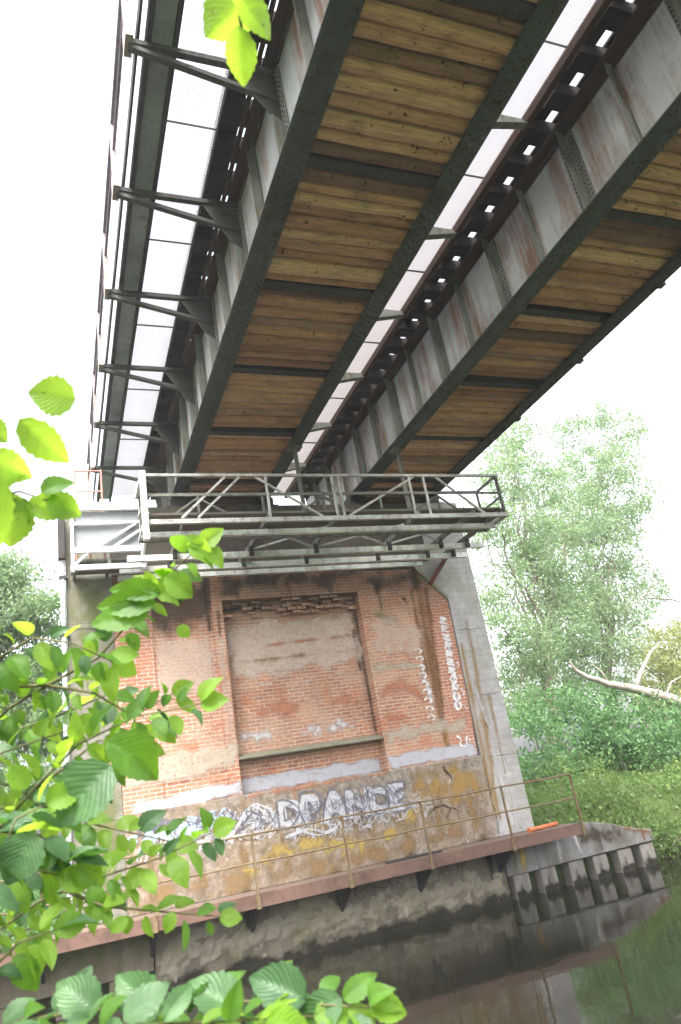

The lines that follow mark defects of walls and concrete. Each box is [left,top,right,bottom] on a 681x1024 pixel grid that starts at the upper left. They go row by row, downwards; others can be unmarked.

peeling [159,640,212,695]
peeling [221,594,361,686]
corrosion [415,634,506,819]
crack [430,789,457,821]
leakage [224,882,561,973]
leakage [167,969,210,993]